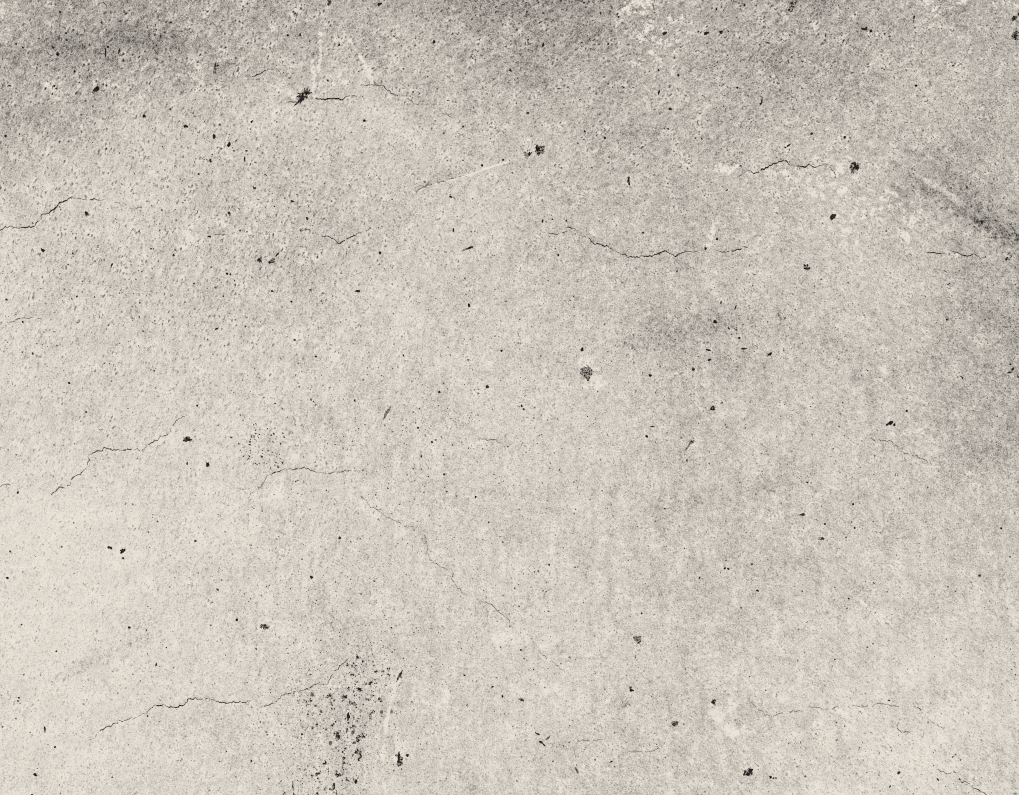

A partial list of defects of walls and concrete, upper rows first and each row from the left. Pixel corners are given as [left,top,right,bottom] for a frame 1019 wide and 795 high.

crack [734,160,836,177]
crack [0,196,140,230]
crack [550,226,698,258]
crack [51,416,183,495]
crack [90,662,345,740]